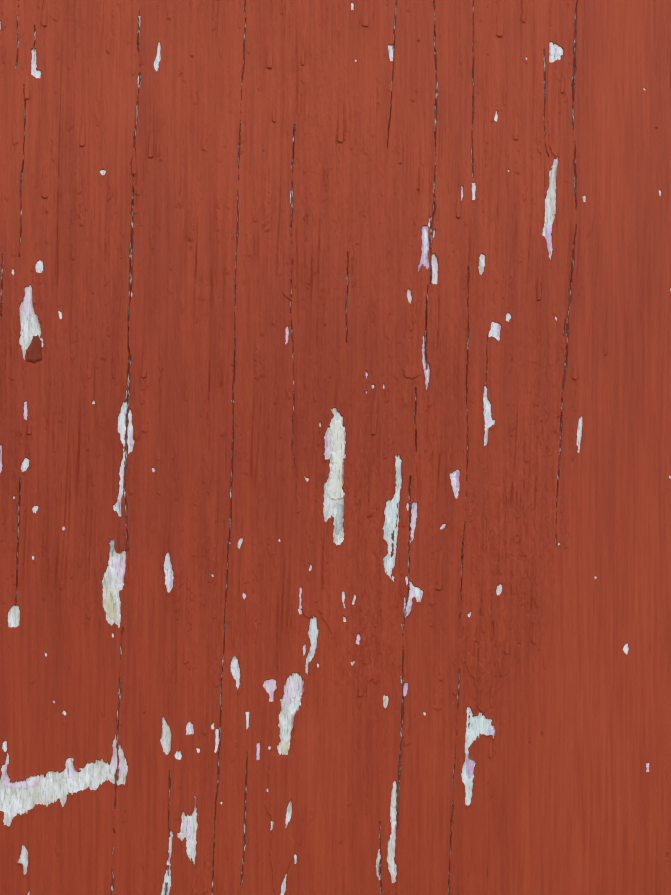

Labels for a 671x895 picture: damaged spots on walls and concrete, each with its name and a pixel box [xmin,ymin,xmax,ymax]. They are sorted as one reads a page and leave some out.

crack [570,0,578,208]
crack [414,0,438,452]
crack [556,230,576,508]
peeling [102,538,127,637]
peeling [319,408,347,545]
peeling [381,455,417,582]
peeling [0,735,128,826]
crack [110,627,124,895]
peeling [161,796,198,895]
peeling [256,588,319,760]
crack [379,477,412,895]
peeling [460,707,496,805]